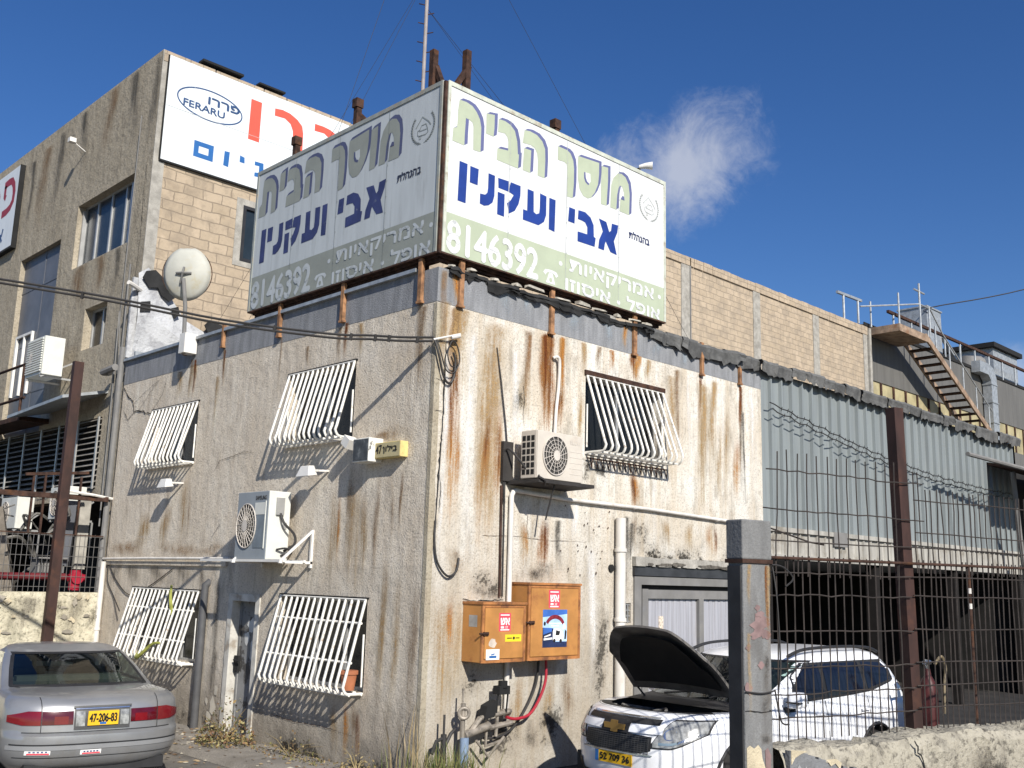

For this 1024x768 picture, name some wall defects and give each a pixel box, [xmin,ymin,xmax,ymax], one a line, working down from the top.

crack [124,382,166,420]
corrosion [522,332,565,415]
corrosion [670,370,679,435]
corrosion [700,376,727,477]
leakage [589,559,609,698]
peeling [745,605,771,651]